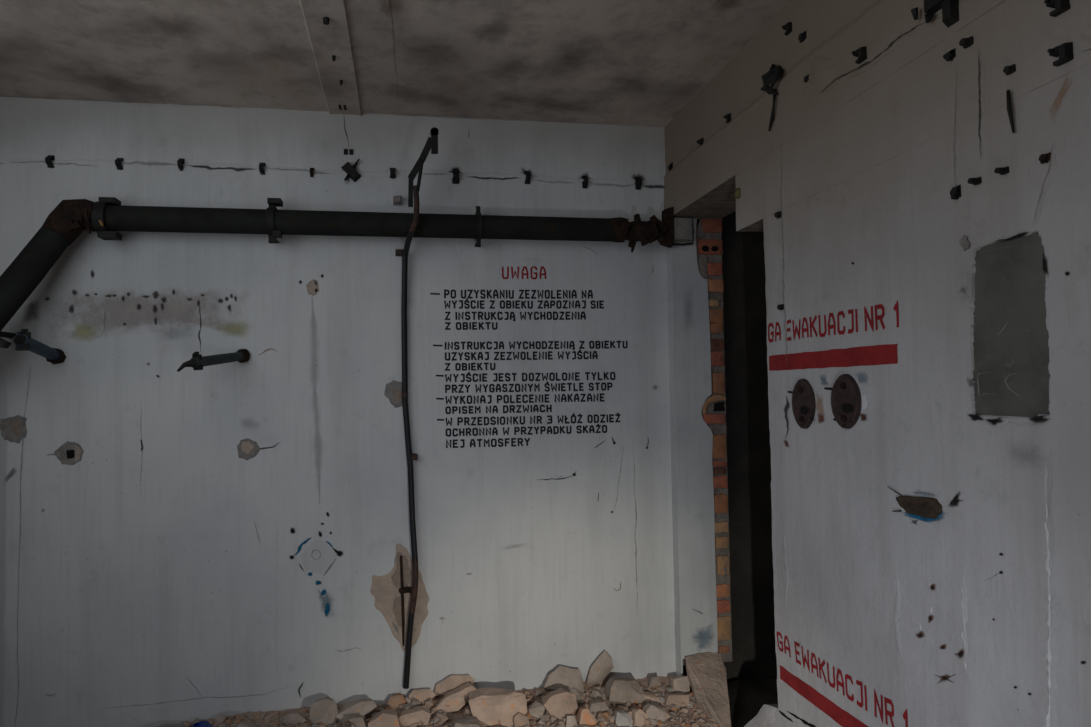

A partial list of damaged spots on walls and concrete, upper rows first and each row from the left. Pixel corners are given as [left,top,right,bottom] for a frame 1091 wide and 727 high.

spalling [384,380,402,408]
spalling [0,415,27,444]
spalling [54,441,84,465]
spalling [237,438,278,460]
spalling [370,544,429,651]
crack [778,710,816,727]